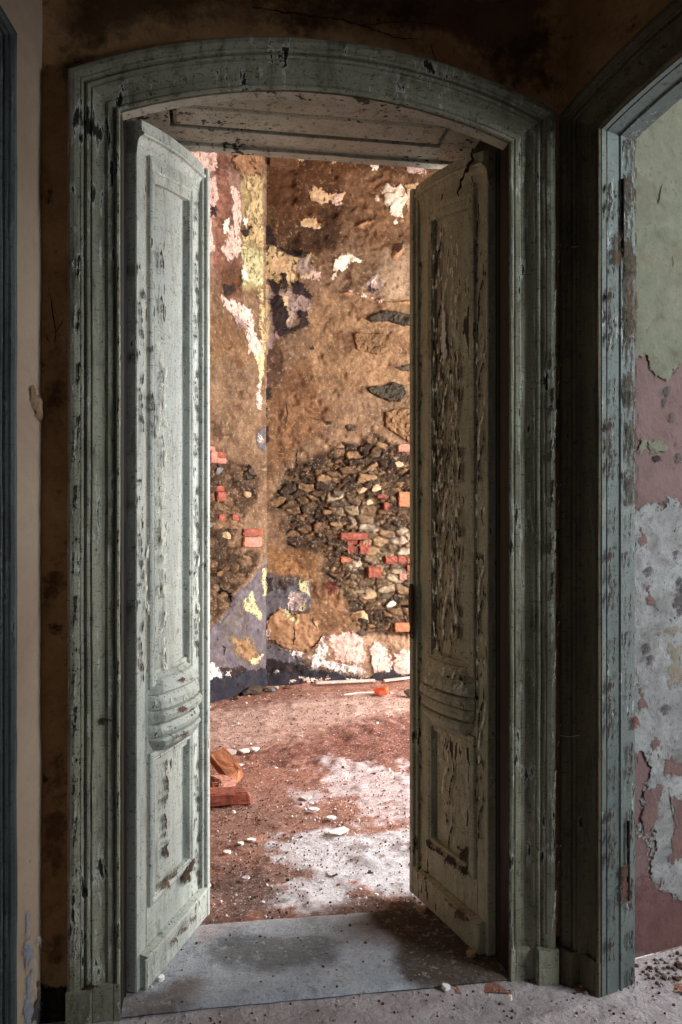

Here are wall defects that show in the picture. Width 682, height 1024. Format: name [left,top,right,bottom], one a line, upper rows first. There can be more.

peeling [191,151,362,663]
peeling [309,219,486,880]
peeling [374,167,427,224]
flaking render [607,99,682,961]